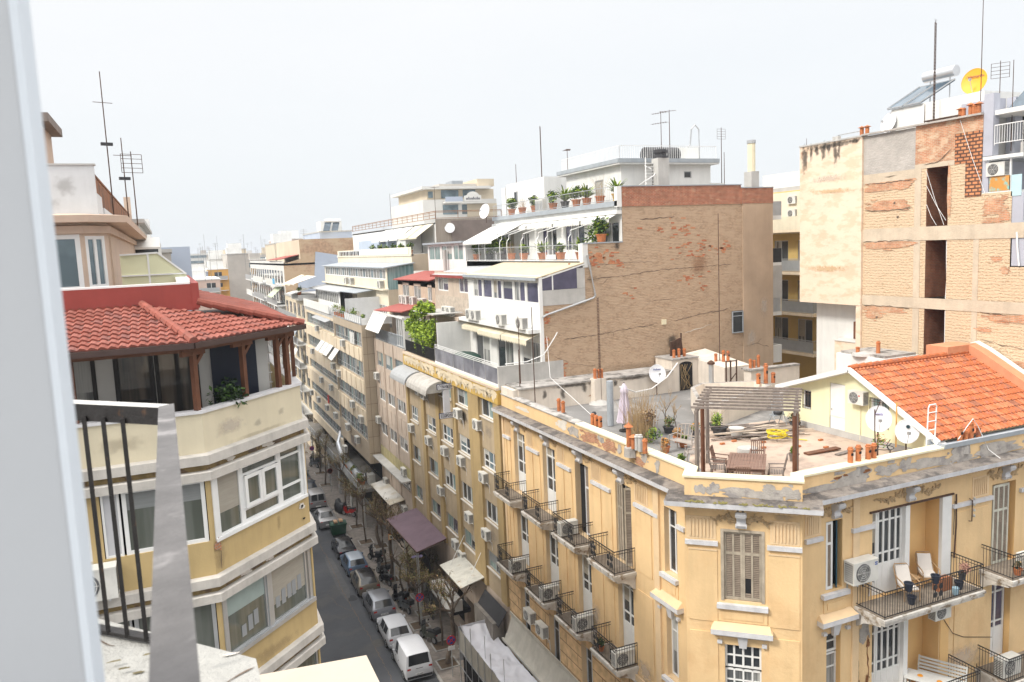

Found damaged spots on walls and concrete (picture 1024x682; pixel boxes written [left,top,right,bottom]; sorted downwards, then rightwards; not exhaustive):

water stain [802,139,858,166]
flaking render [864,178,917,218]
crack [588,261,730,280]
flaking render [694,440,1024,501]